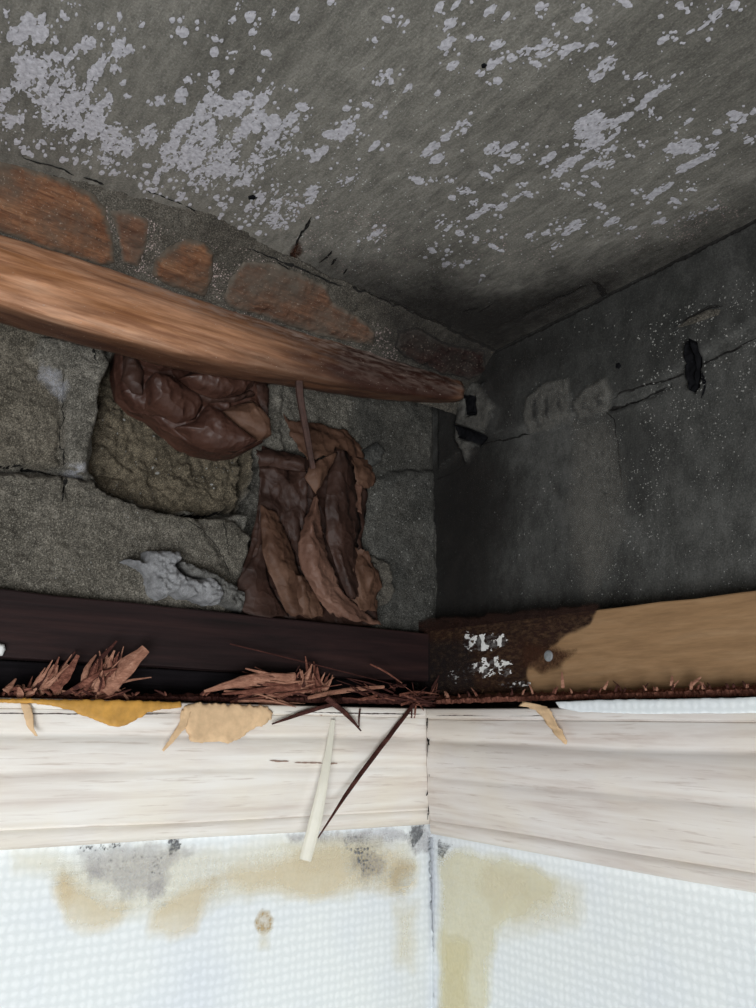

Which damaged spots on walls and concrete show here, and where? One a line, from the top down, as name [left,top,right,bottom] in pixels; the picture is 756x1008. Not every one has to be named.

crack [247,218,415,314]
spalling [683,338,706,396]
spalling [464,395,477,416]
spalling [453,424,488,445]
crack [607,338,756,491]
leakage [344,836,381,872]